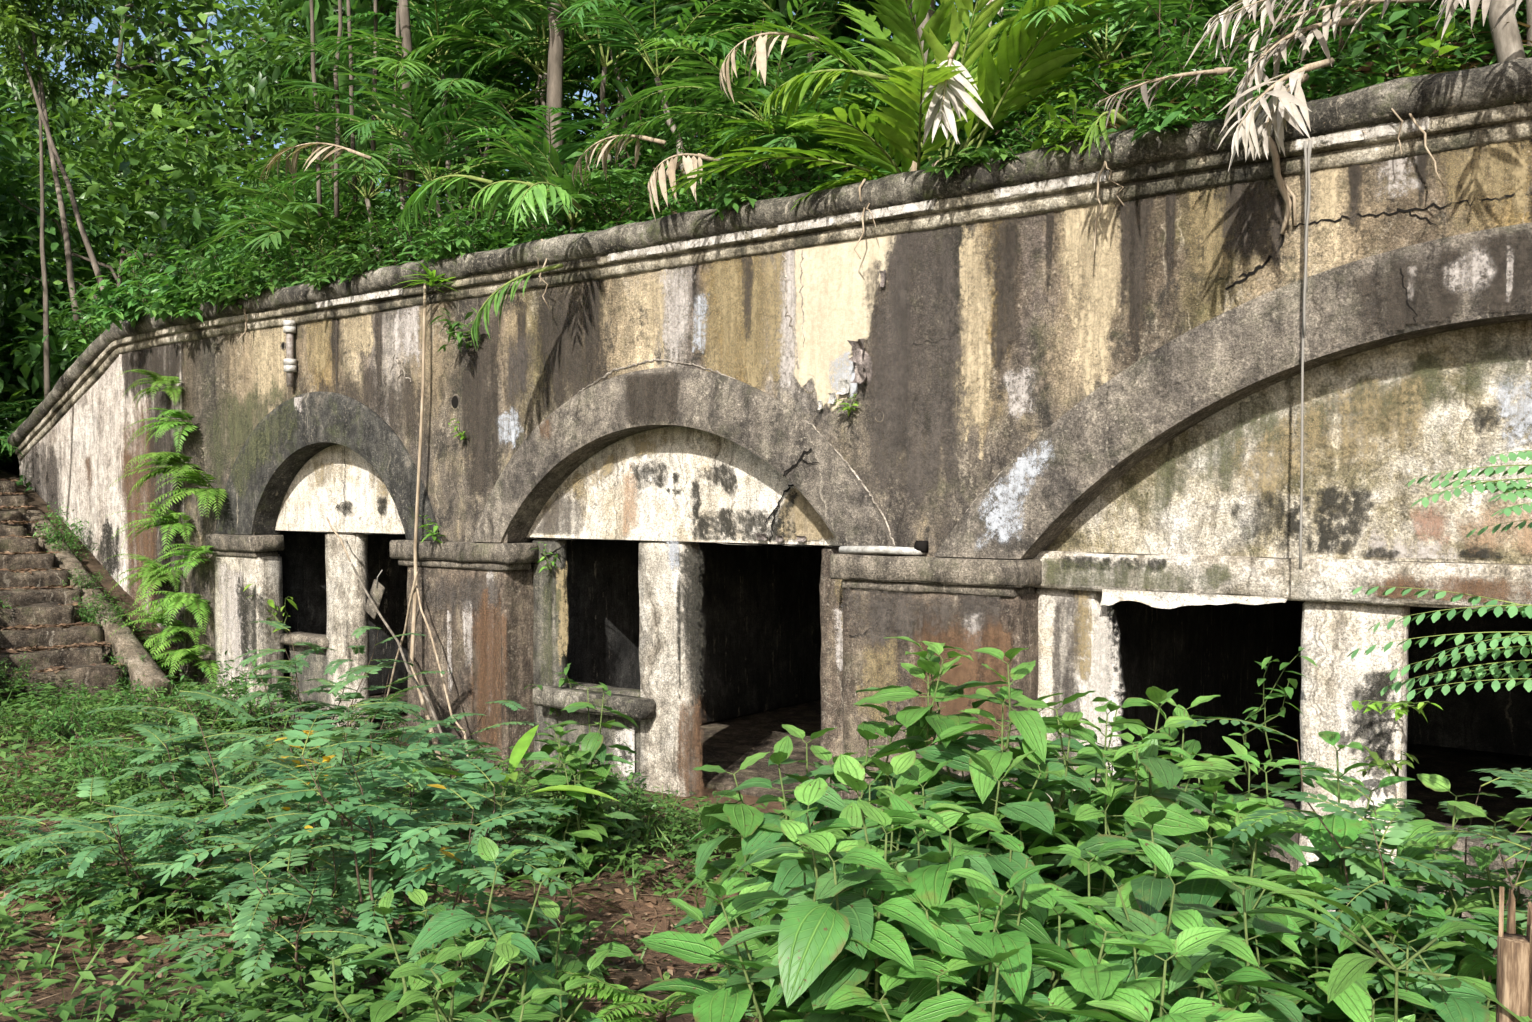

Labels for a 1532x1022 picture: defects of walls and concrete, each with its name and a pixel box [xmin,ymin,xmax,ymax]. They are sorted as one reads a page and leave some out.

peeling [608,198,937,411]
damp [805,217,1034,545]
damp [1046,179,1284,395]
damp [1146,352,1456,559]
crack [1225,192,1532,290]
crack [1400,268,1418,322]
damp [1464,342,1529,432]
rust [471,589,507,755]